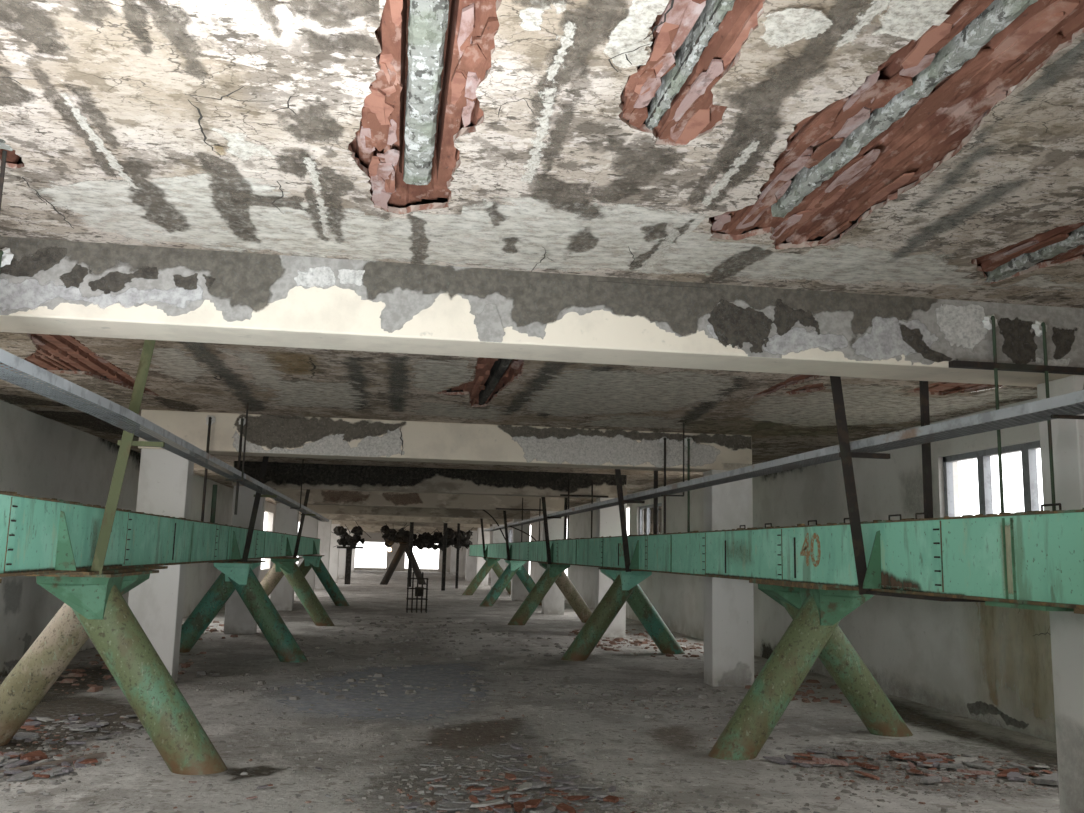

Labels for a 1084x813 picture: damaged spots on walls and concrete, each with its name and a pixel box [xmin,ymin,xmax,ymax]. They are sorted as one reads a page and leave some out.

crack [185,86,299,157]
spalling [348,0,502,214]
spalling [618,0,767,146]
spalling [709,0,1084,249]
leakage [0,0,1084,367]
spalling [971,222,1084,284]
peeling [0,256,253,322]
peeling [268,255,444,333]
peeling [457,292,614,342]
peeling [892,299,1084,368]
spalling [437,357,525,407]
peeling [234,414,406,449]